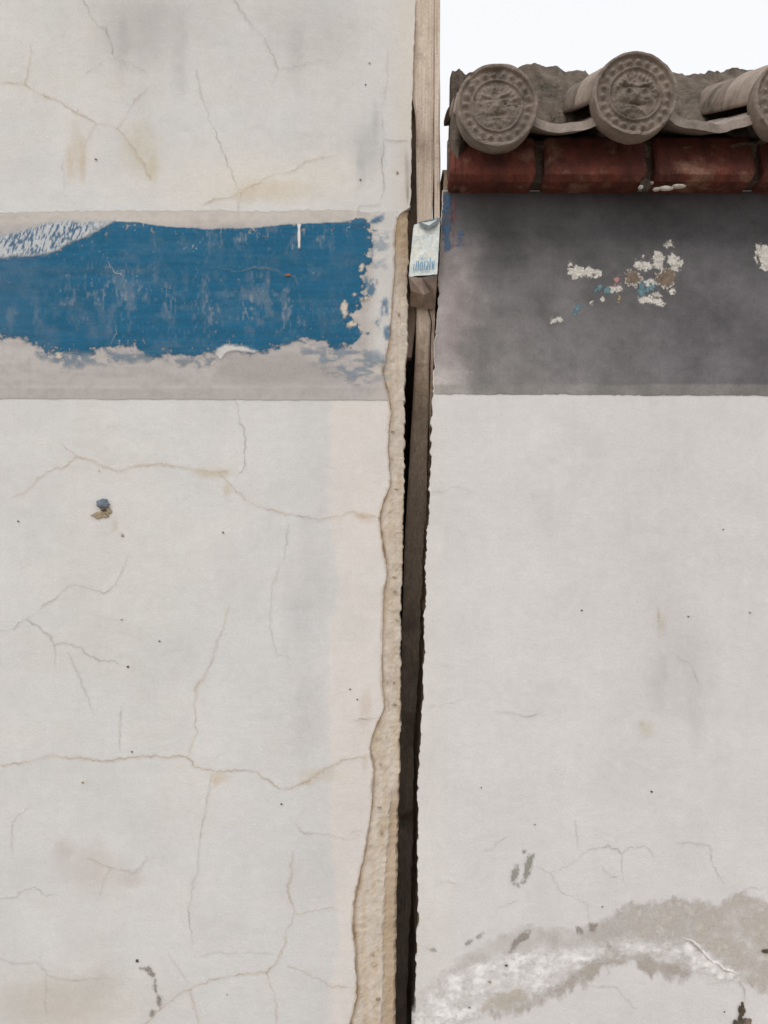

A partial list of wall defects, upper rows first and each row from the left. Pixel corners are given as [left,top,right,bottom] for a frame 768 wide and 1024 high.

peeling [550,240,684,324]
peeling [754,244,768,271]
peeling [0,212,410,1024]
damp [549,894,768,995]